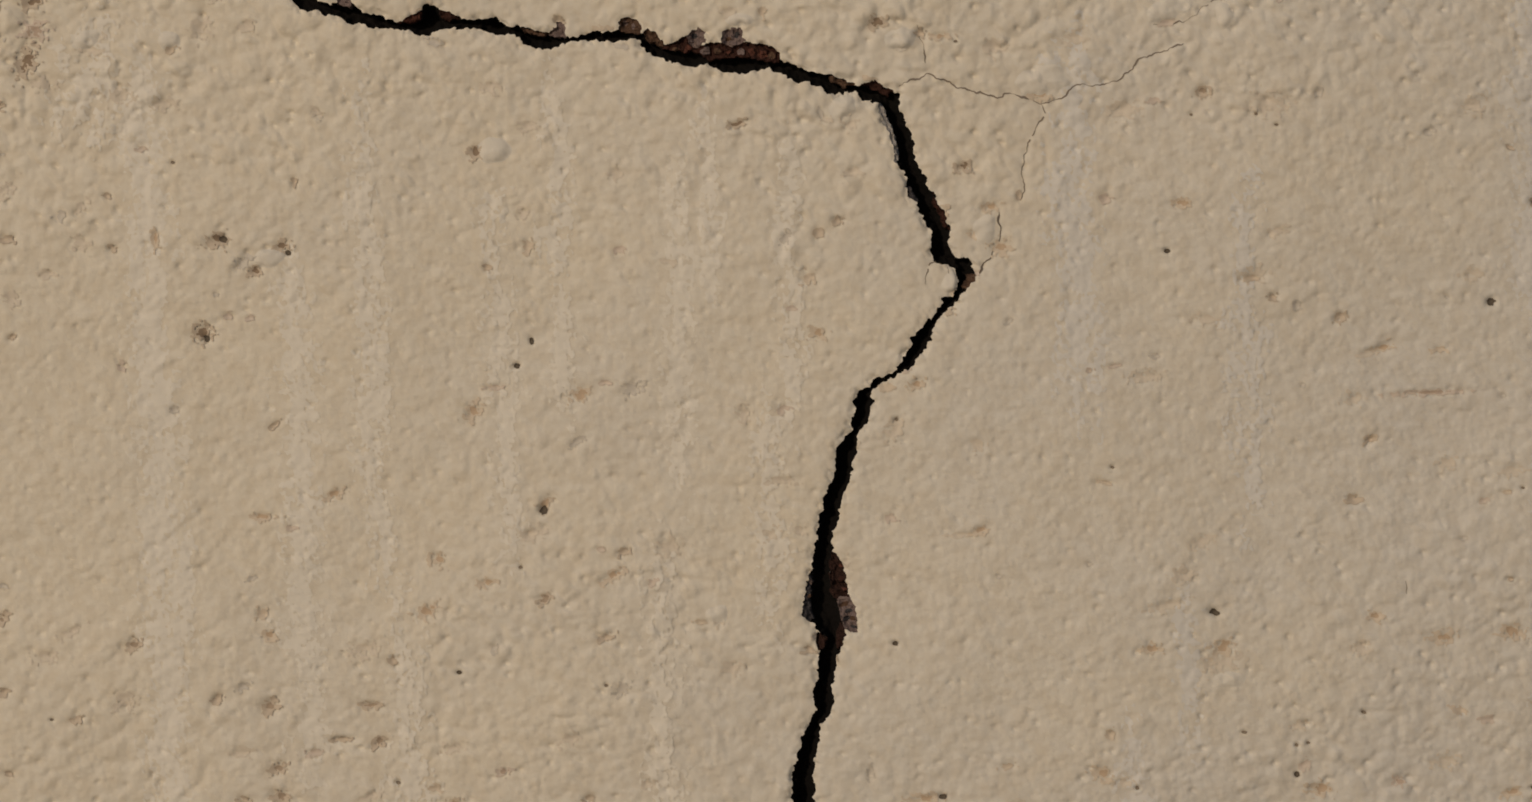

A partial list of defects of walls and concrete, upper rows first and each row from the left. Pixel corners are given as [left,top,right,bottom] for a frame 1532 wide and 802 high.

crack [292,0,1213,802]